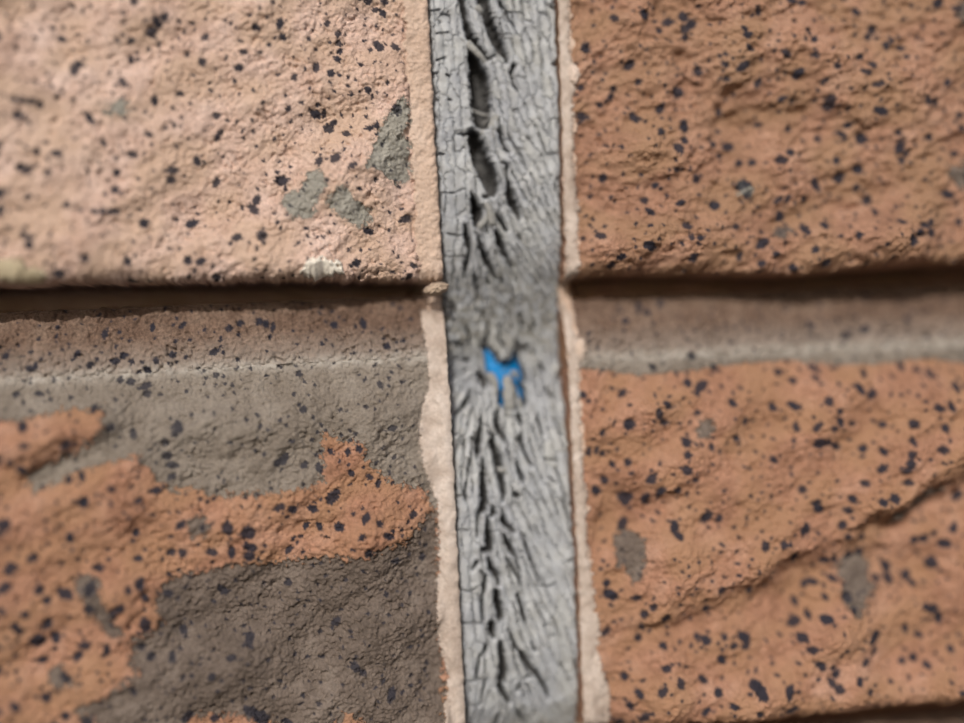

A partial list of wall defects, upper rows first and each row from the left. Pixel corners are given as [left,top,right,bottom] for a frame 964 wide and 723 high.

crack [456,0,521,304]
crack [454,395,549,723]